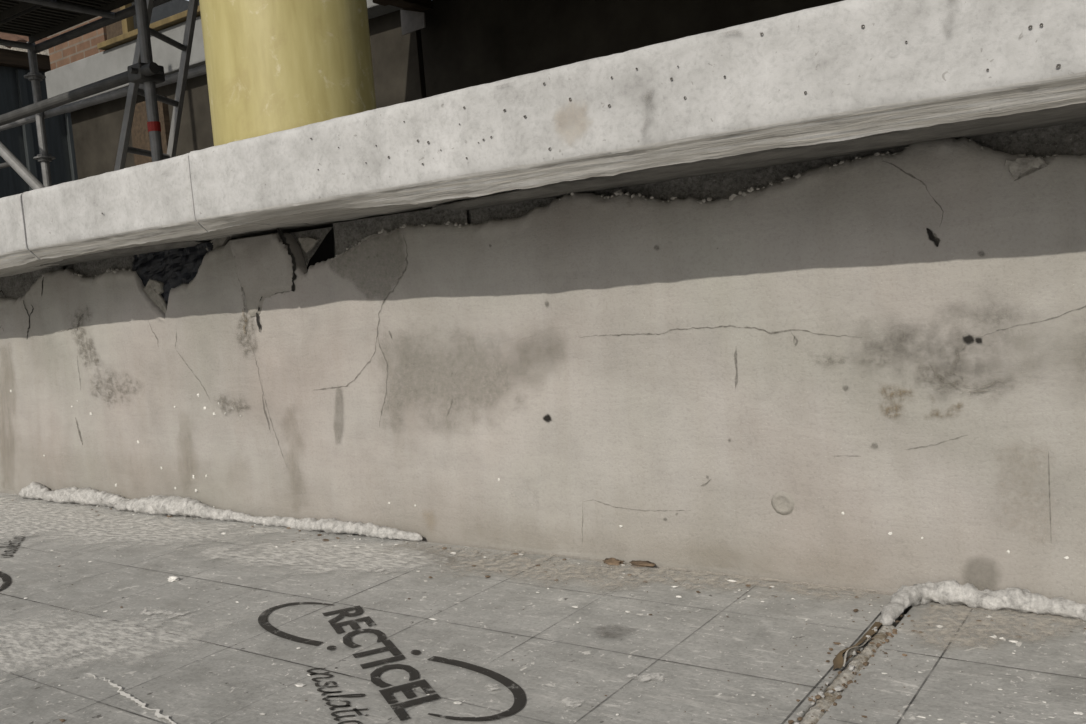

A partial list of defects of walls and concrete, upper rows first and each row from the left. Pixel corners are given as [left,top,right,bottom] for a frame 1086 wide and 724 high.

spalling [969,122,1086,179]
spalling [0,237,231,313]
crack [275,228,334,294]
spalling [331,146,909,261]
spalling [926,228,940,247]
crack [323,241,408,414]